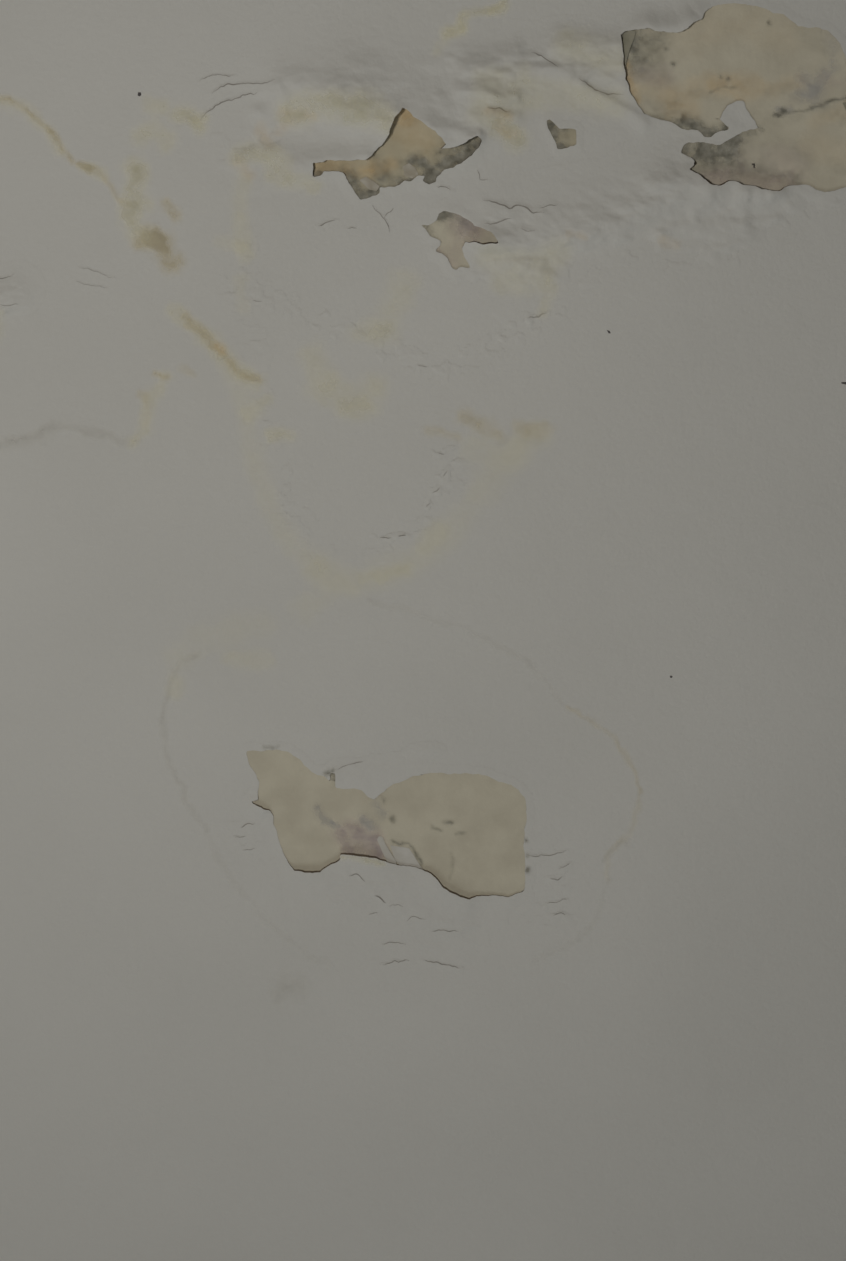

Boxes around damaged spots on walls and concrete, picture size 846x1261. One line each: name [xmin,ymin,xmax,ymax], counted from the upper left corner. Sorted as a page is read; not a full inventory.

peeling [313,108,498,281]
peeling [542,113,584,159]
peeling [614,0,846,213]
peeling [237,740,536,914]